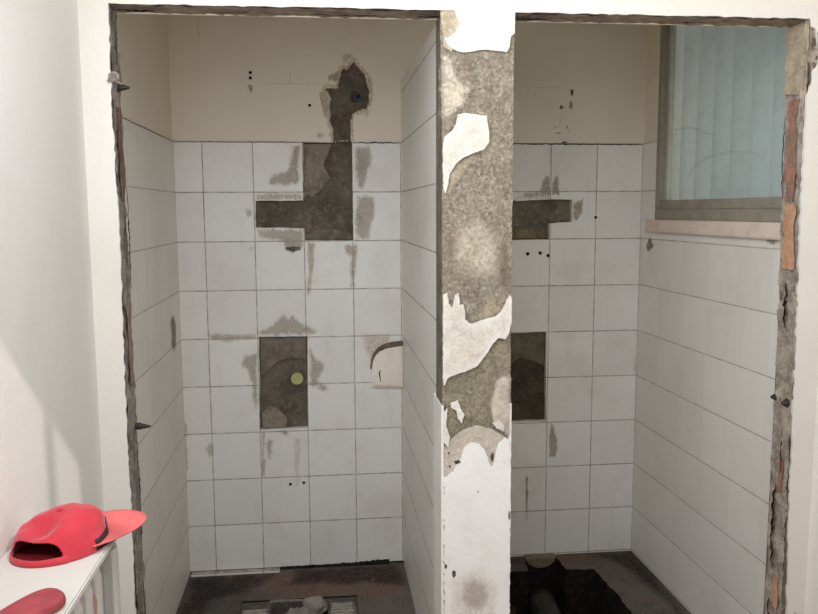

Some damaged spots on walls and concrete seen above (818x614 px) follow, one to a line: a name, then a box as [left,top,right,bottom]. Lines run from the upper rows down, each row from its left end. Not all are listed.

flaking render [117,107,126,202]
flaking render [782,19,818,270]
spalling [440,10,545,478]
flaking render [126,303,134,383]
peeling [259,336,308,428]